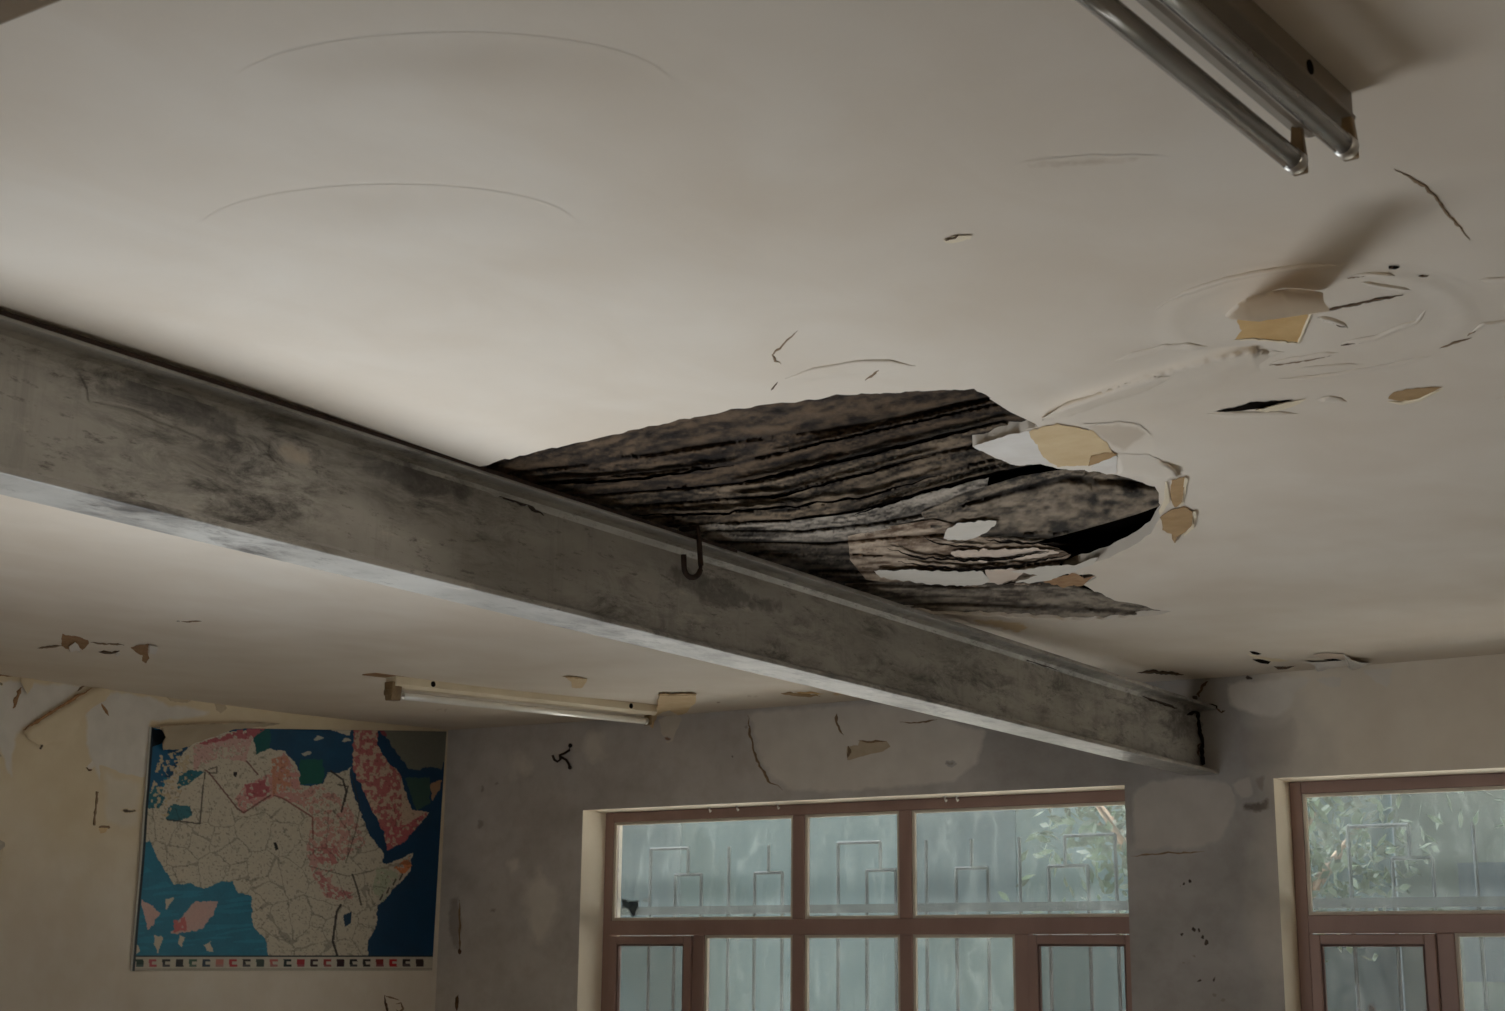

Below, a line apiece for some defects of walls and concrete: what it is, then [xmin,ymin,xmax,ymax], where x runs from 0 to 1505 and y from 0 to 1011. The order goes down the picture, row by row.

crack [1394,169,1470,240]
crack [1269,266,1429,366]
crack [1439,331,1476,349]
damp [80,374,492,519]
peeling [974,424,1196,543]
damp [643,555,804,622]
peeling [875,520,1098,586]
peeling [39,634,158,663]
damp [954,618,1032,635]
peeling [0,678,214,833]
damp [1160,708,1203,751]
crack [1138,669,1253,765]